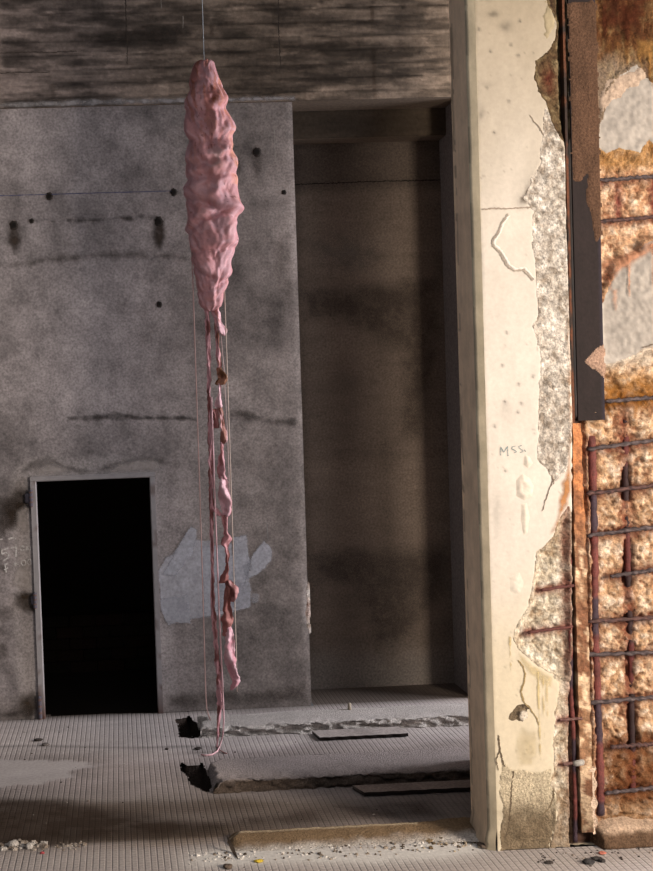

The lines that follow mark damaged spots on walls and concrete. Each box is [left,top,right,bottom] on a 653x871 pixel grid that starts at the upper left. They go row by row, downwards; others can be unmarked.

crack [482,206,534,281]
spalling [523,0,653,822]
rust [560,423,594,833]
crack [518,660,539,725]
spalling [499,506,574,851]
crack [496,735,506,770]
rust [609,736,653,799]
peeling [582,837,606,865]